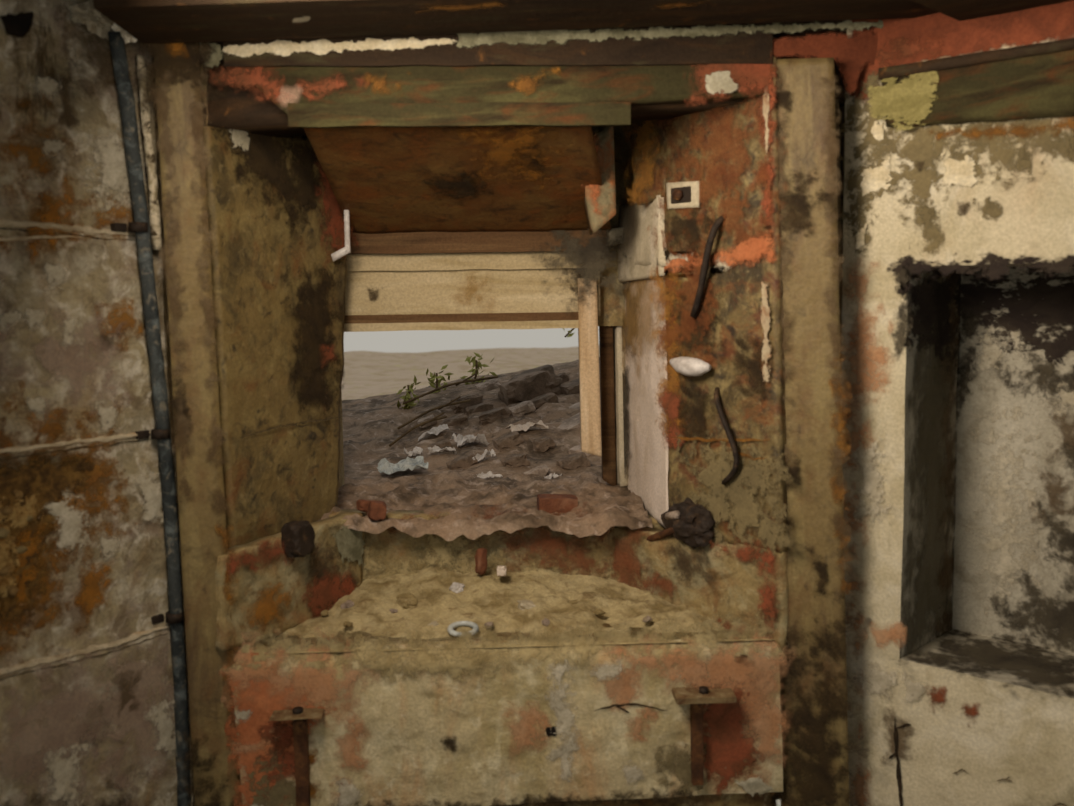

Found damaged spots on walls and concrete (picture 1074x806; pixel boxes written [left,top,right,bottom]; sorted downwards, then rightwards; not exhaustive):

spalling [67,0,137,45]
peeling [84,127,132,211]
peeling [198,0,1074,226]
water stain [839,74,1074,254]
water stain [288,266,344,430]
peeling [761,282,771,382]
water stain [892,297,912,356]
spalling [0,453,119,631]
rust [0,382,129,647]
peeling [135,472,164,528]
peeling [221,636,361,806]
peeling [408,625,787,806]